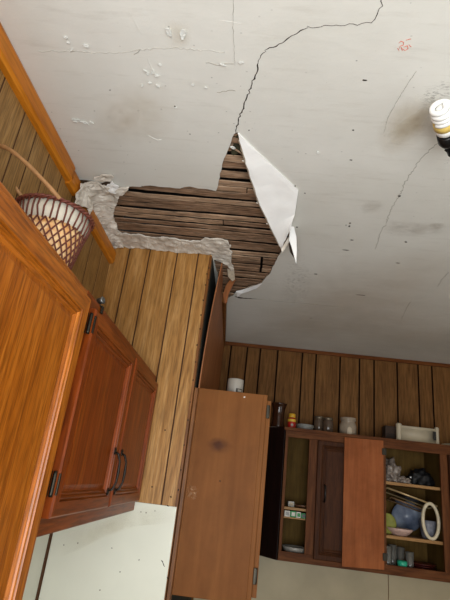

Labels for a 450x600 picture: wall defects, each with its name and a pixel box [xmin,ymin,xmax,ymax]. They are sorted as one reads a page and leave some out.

crack [217,0,383,134]
spalling [118,230,235,281]